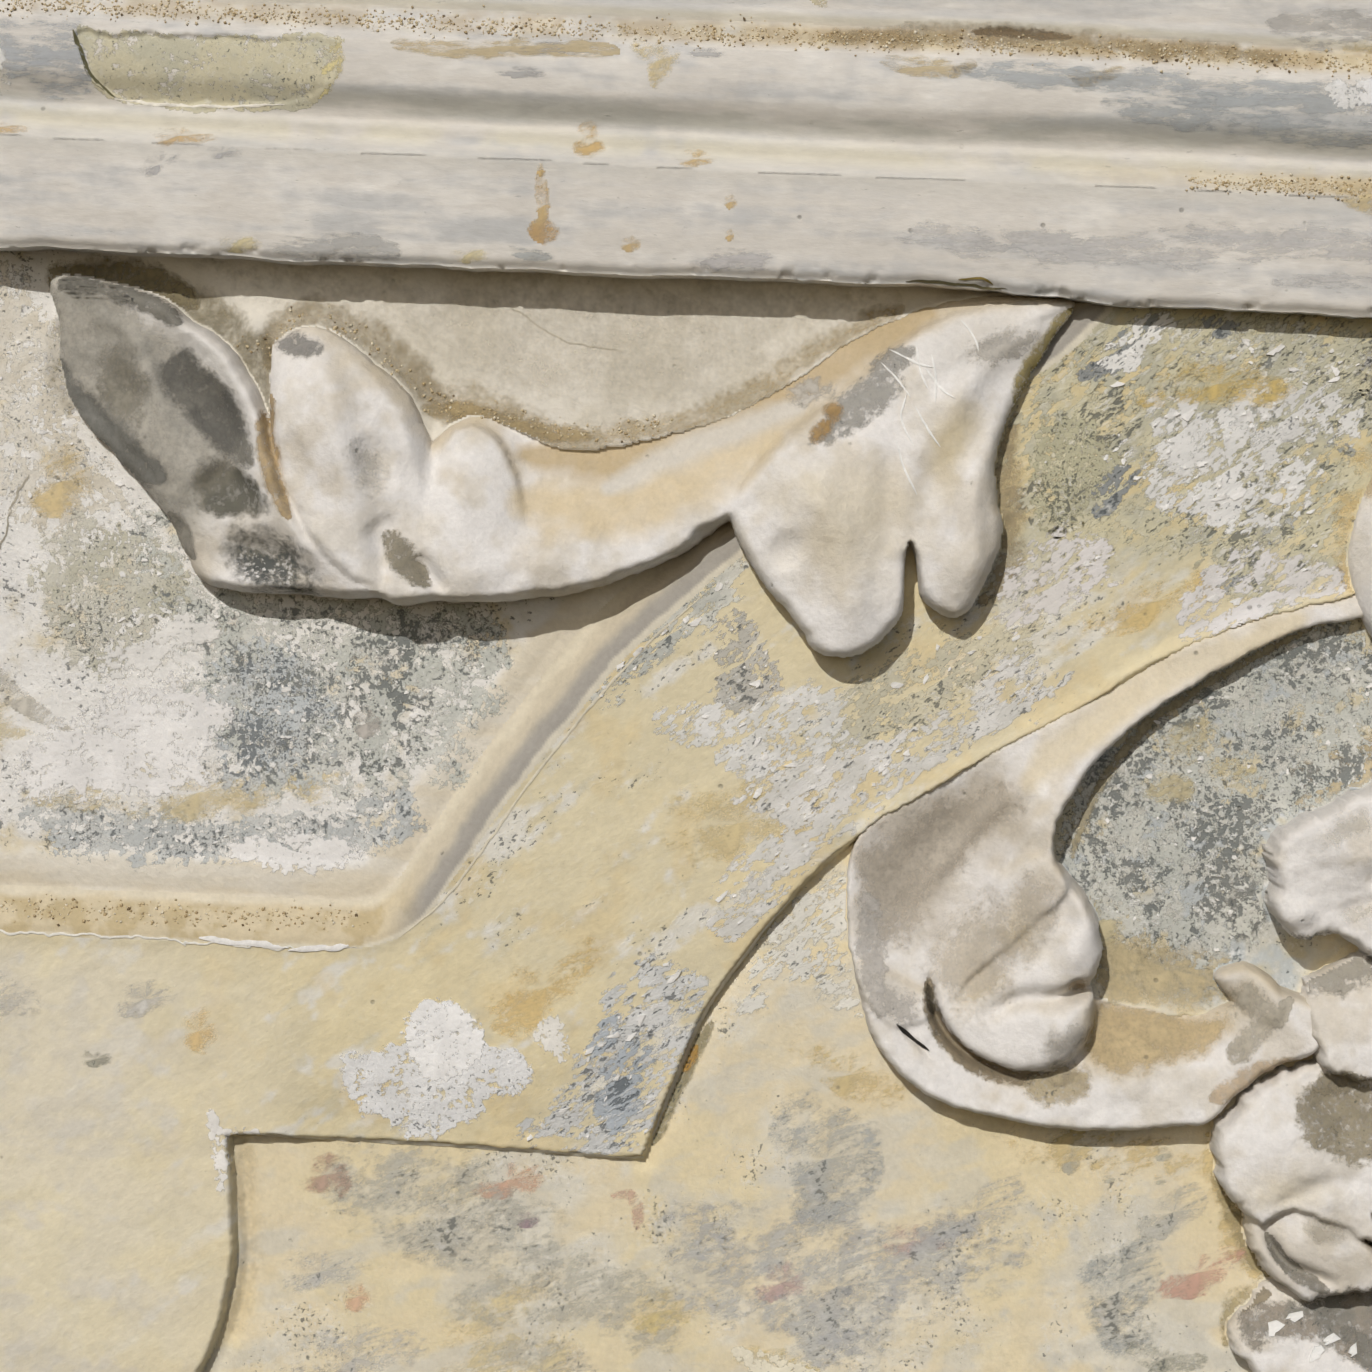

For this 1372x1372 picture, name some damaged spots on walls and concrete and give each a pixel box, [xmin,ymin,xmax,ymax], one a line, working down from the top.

spalling [72,24,345,114]
peeling [1324,78,1372,124]
crack [0,475,29,548]
peeling [0,261,512,868]
peeling [589,309,1372,969]
peeling [516,953,709,1155]
damp [1312,1072,1367,1096]